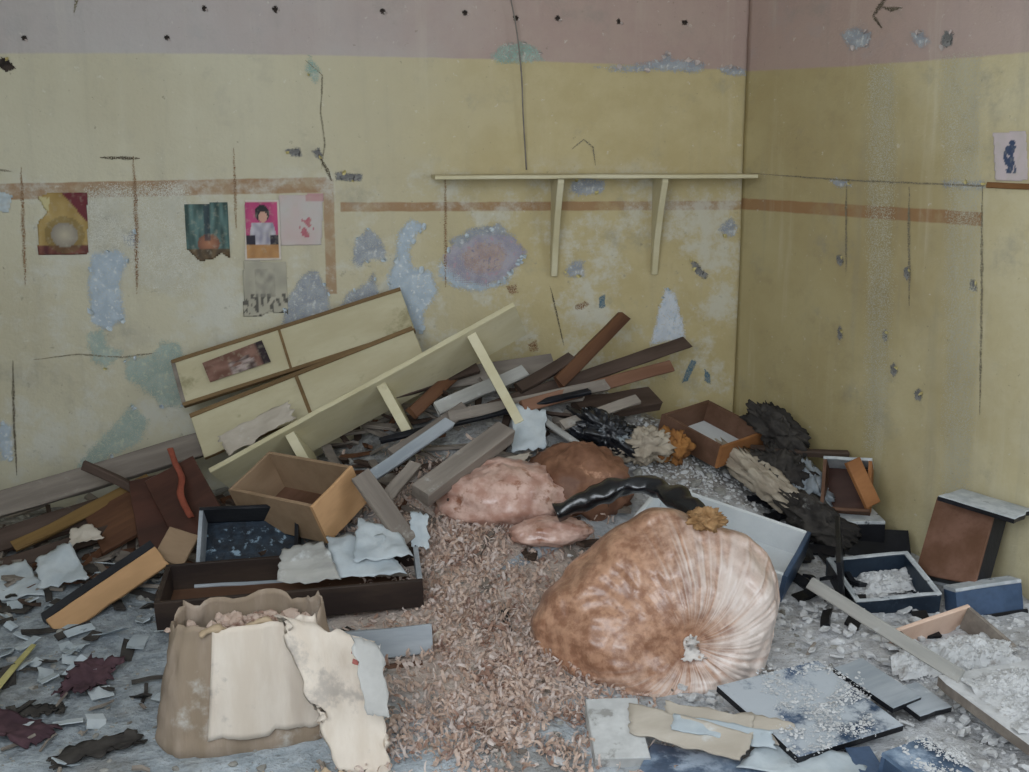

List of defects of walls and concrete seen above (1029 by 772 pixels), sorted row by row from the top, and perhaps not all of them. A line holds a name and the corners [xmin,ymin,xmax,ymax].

crack [872,0,903,28]
peeling [594,51,706,75]
spalling [281,219,527,334]
peeling [650,288,686,347]
peeling [123,339,185,409]
peeling [74,403,151,468]